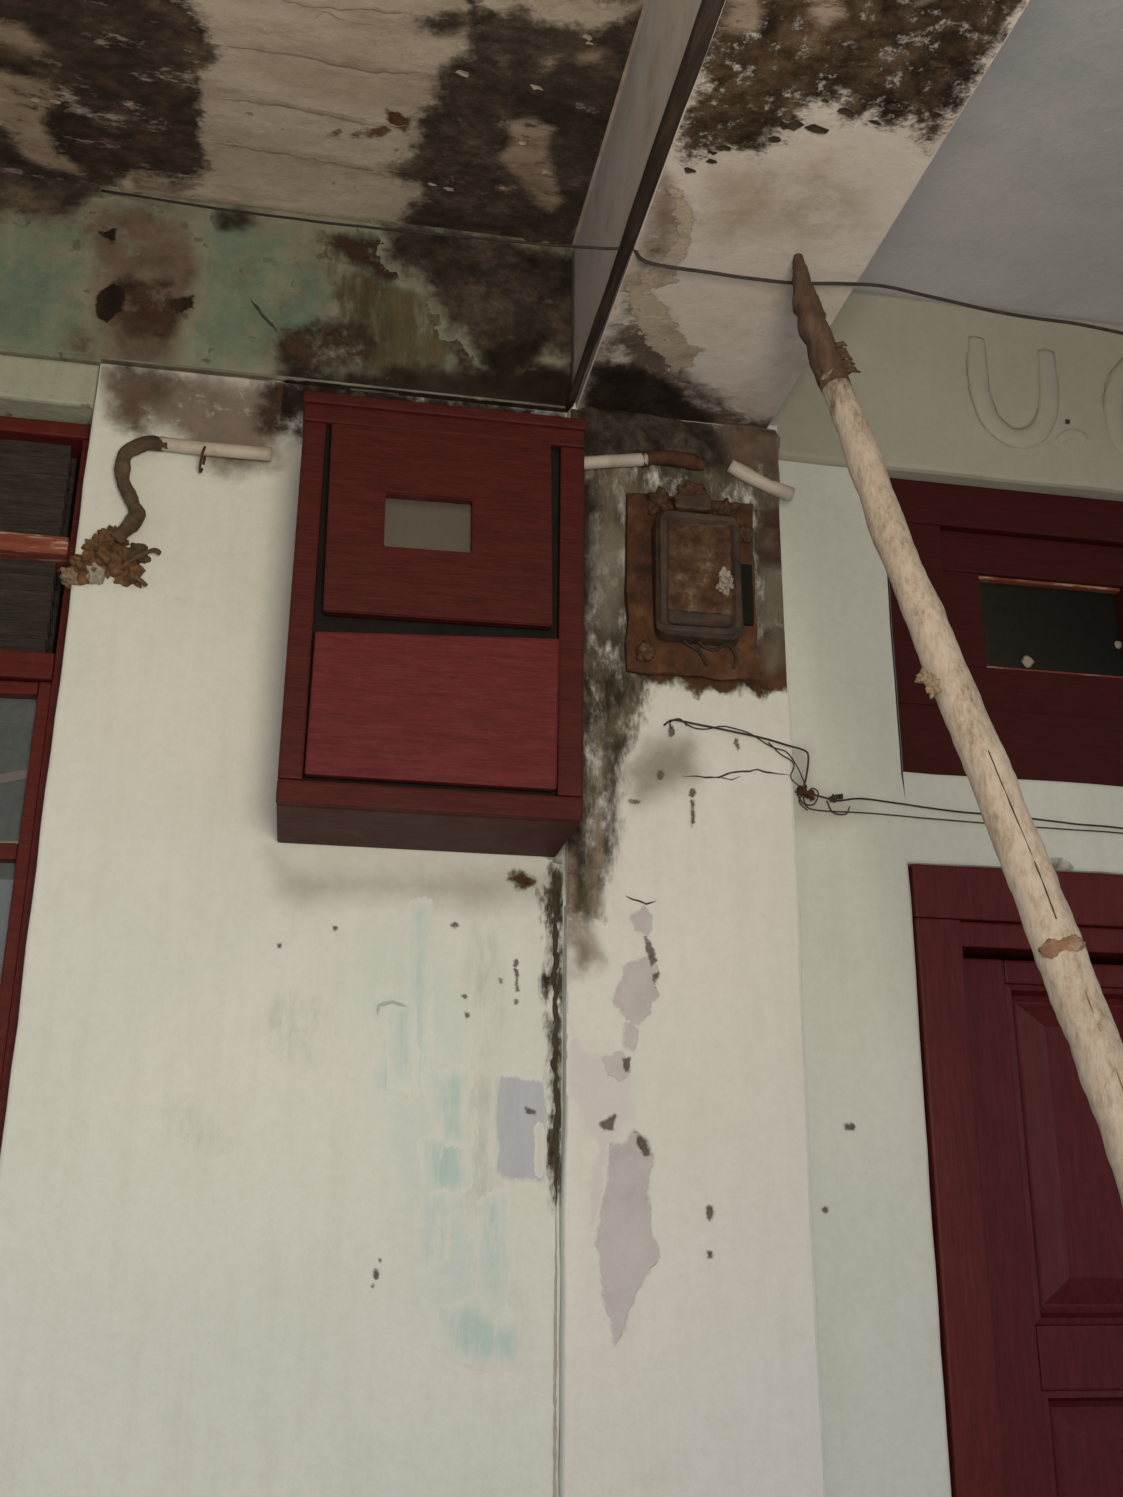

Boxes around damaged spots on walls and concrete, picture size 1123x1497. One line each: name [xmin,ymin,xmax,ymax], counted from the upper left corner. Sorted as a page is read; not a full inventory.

damp [0,0,645,487]
damp [672,0,1123,264]
damp [540,421,785,992]
corrosion [635,626,787,698]
corrosion [645,479,782,615]
peeling [494,1074,548,1183]
peeling [566,904,661,1347]